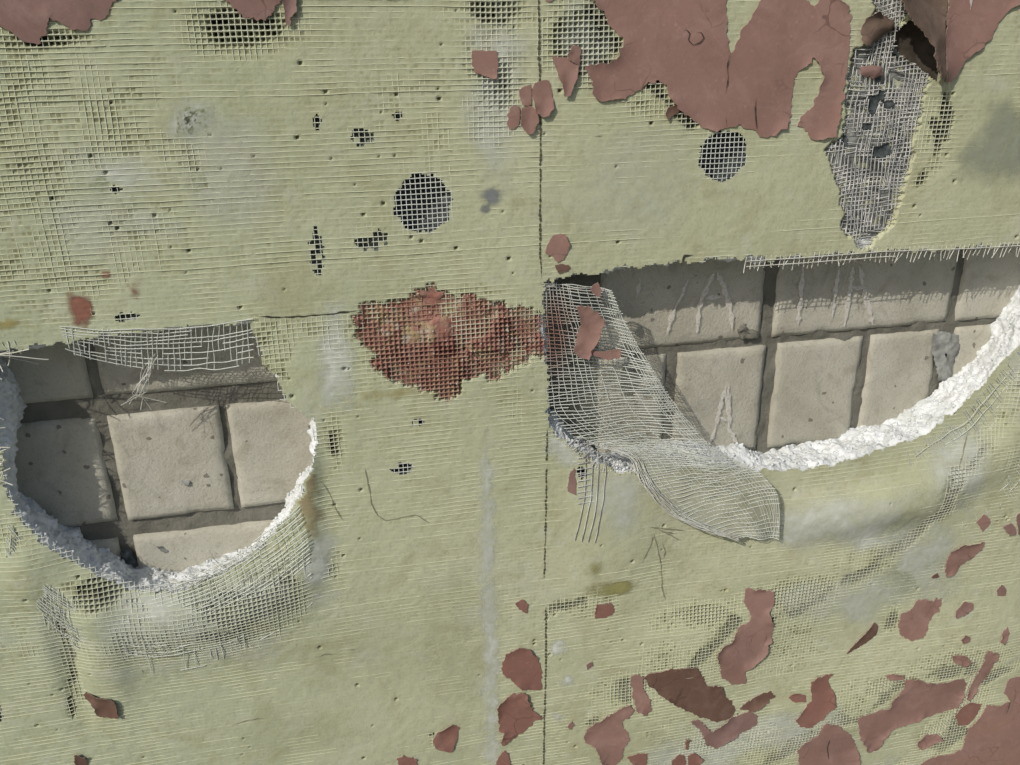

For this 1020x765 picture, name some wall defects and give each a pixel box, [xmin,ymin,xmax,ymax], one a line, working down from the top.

peeling [507,0,1020,183]
spalling [393,173,453,233]
spalling [644,284,1020,472]
spalling [0,341,318,593]
peeling [932,514,991,579]
peeling [717,587,775,685]
peeling [846,622,878,654]
peeling [898,597,942,641]
peeling [496,648,545,765]
peeling [584,674,652,765]
peeling [691,691,775,749]
peeling [788,627,1020,765]